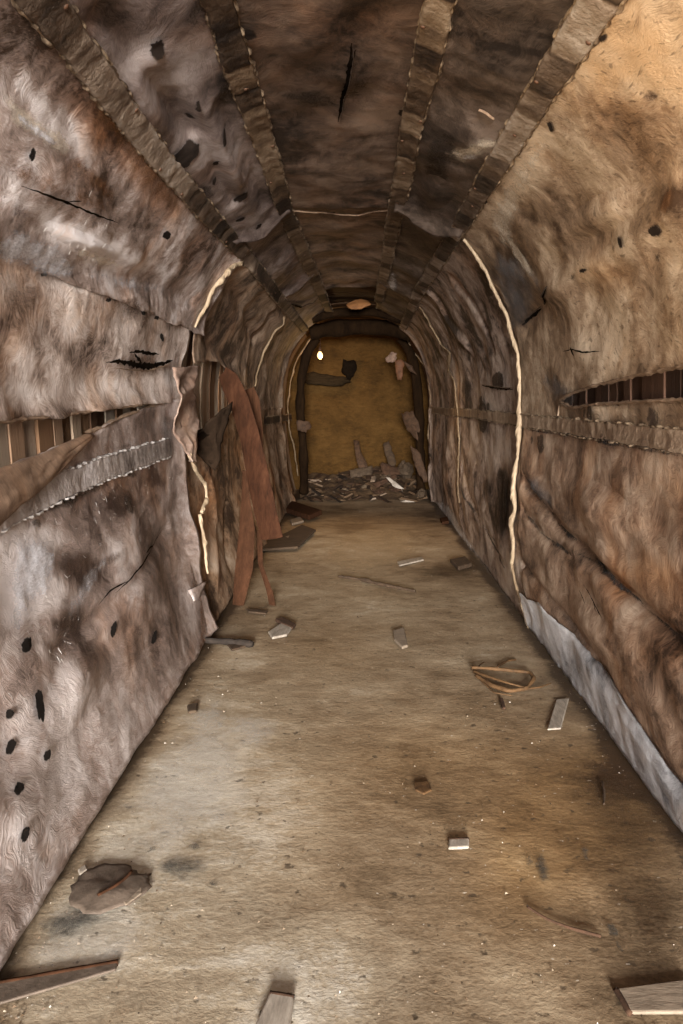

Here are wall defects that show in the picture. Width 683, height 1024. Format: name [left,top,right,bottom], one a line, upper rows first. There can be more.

crack [22,186,118,223]
peeling [0,433,95,526]
crack [100,535,159,603]